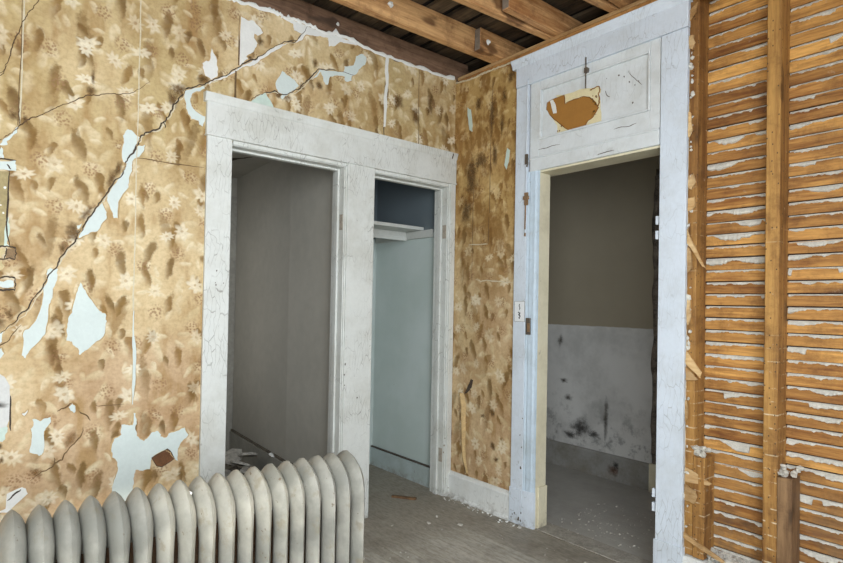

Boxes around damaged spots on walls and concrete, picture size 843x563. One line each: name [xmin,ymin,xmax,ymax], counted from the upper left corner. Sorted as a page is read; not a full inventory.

crack [0,0,39,76]
peeling [183,15,367,126]
crack [251,68,352,100]
peeling [77,129,146,239]
crack [0,27,307,346]
peeling [22,268,58,358]
peeling [65,282,107,355]
flaking render [704,0,768,563]
crack [30,403,121,481]
peeling [110,310,189,501]
water stain [566,422,597,438]
flaking render [786,307,843,563]